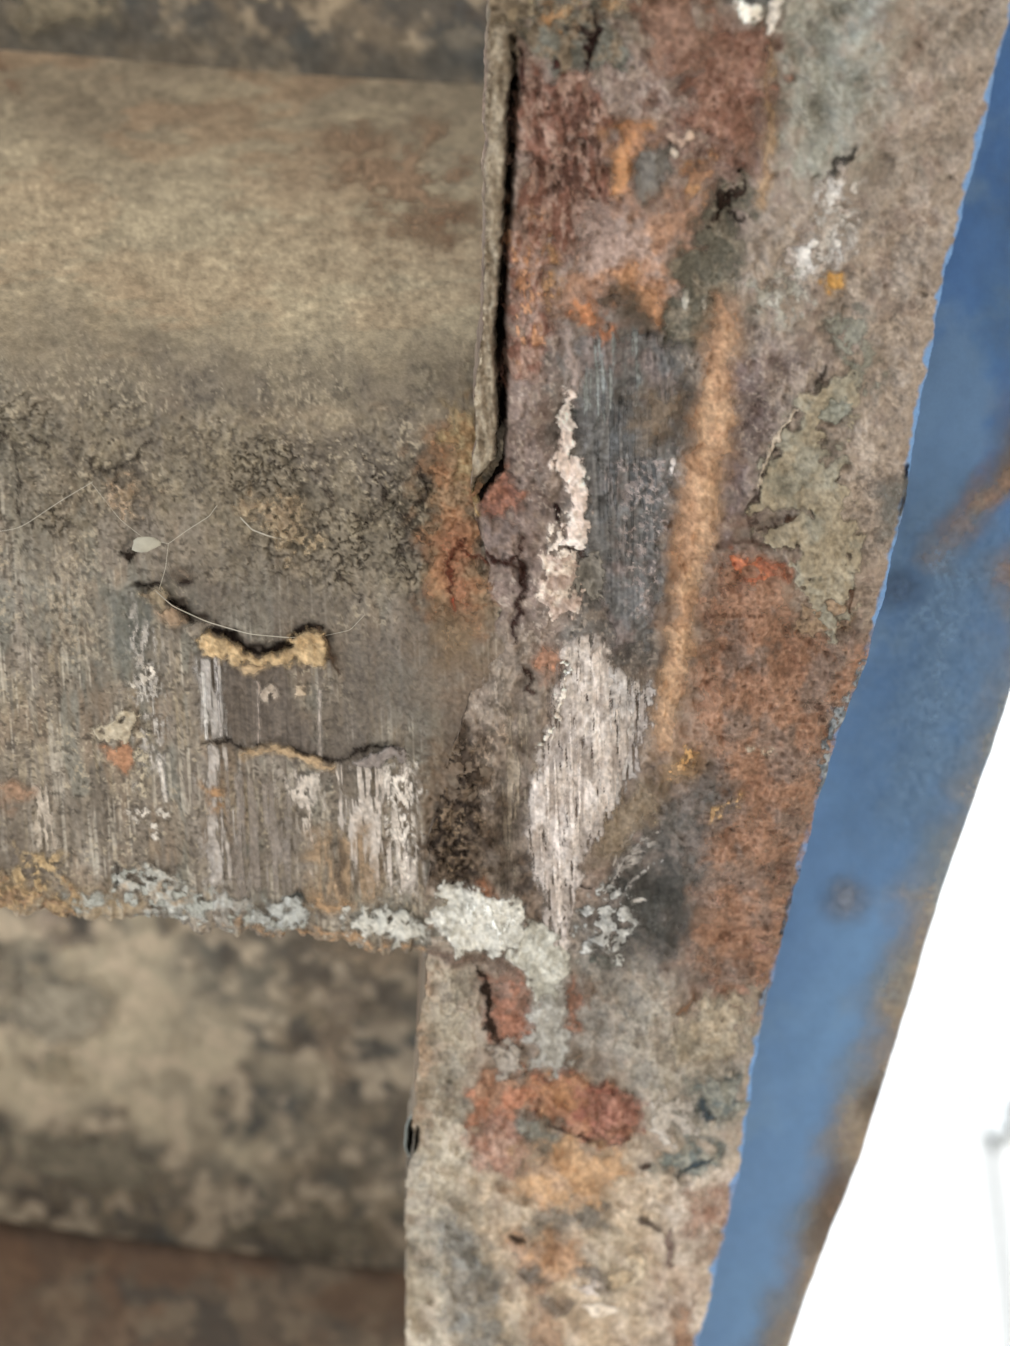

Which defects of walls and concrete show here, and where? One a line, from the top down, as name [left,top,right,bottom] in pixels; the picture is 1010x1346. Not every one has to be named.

crack [494,42,525,457]
rust [498,0,793,386]
rust [415,408,493,661]
crack [136,582,340,675]
crack [507,558,536,695]
rust [653,294,872,1007]
crack [202,737,407,770]
water stain [534,644,658,918]
crack [476,949,523,1049]
rust [483,970,536,1046]
rust [465,1051,646,1212]
rust [504,1227,583,1346]